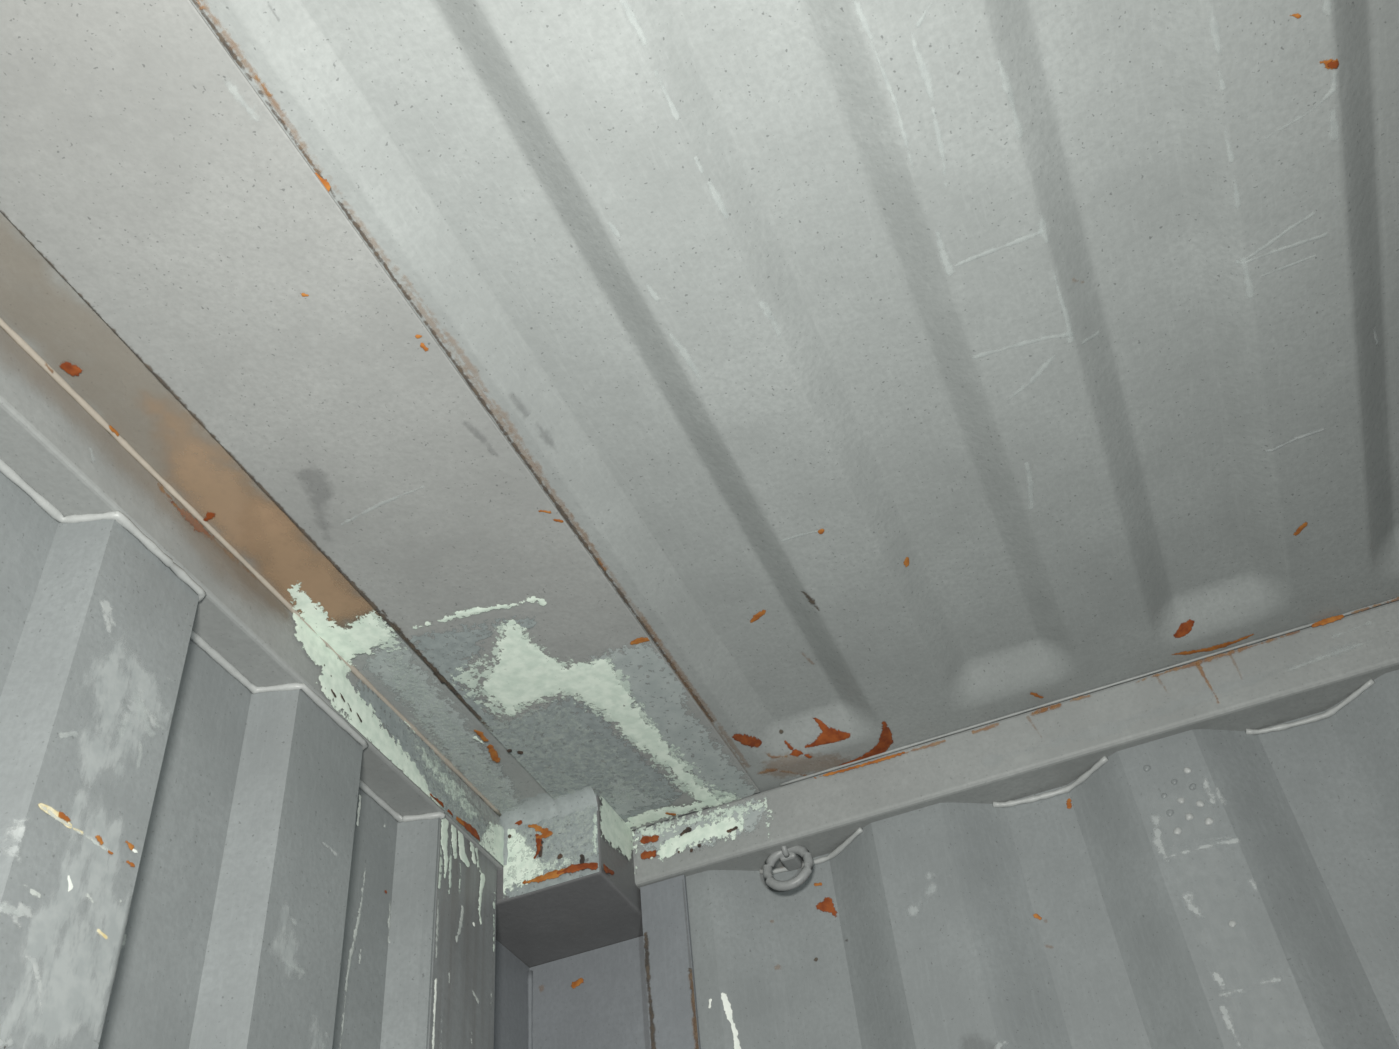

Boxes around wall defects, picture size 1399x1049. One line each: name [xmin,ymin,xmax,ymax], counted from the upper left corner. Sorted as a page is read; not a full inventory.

corrosion [160,487,253,576]
corrosion [1143,597,1399,703]
corrosion [1030,692,1090,714]
peeling [287,583,774,899]
corrosion [732,718,945,779]
corrosion [522,862,614,884]
corrosion [814,883,837,917]